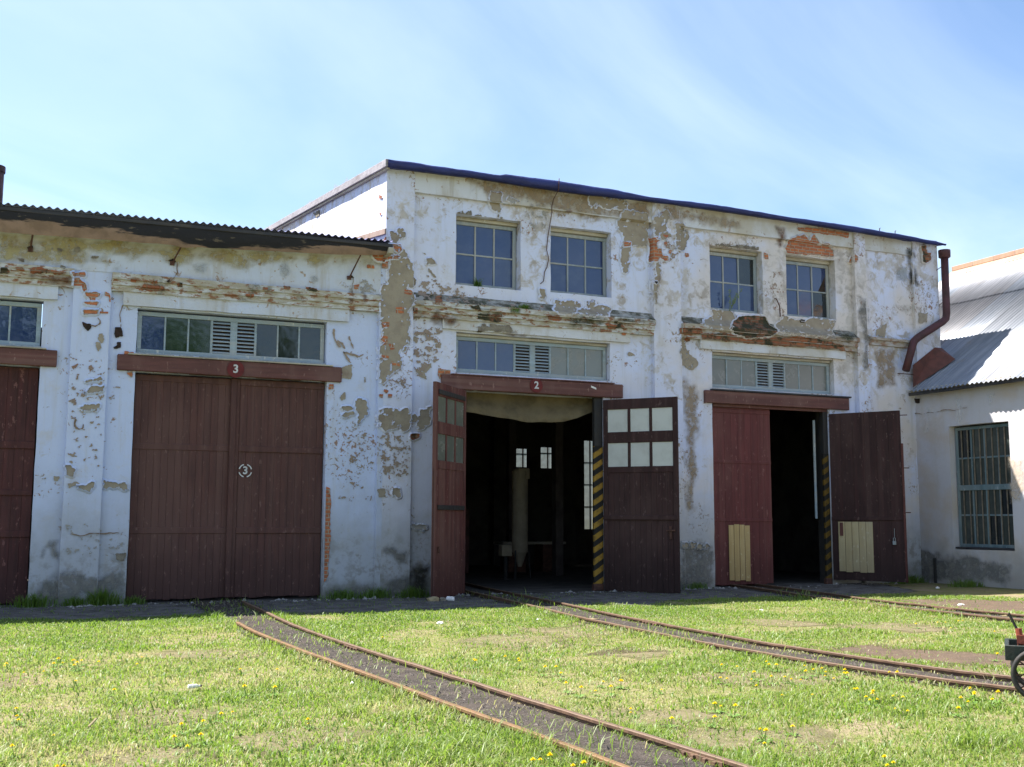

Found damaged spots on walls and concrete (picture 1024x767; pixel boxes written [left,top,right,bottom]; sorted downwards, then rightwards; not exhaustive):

flaking render [130,278,183,292]
peeling [588,196,690,312]
flaking render [783,227,849,259]
flaking render [0,246,134,494]
peeling [324,226,626,582]